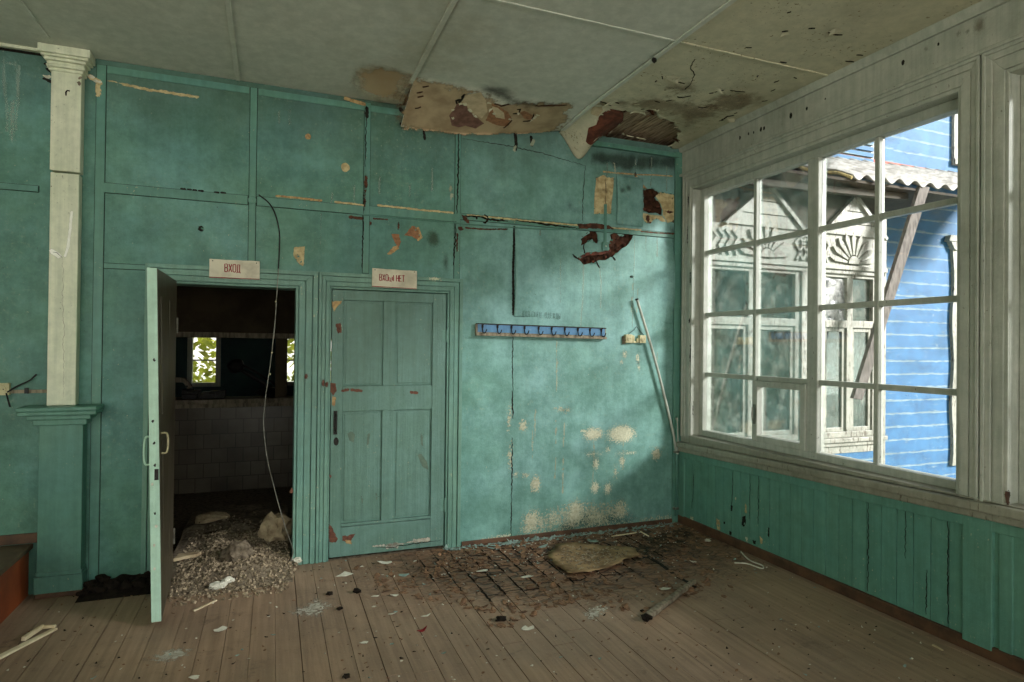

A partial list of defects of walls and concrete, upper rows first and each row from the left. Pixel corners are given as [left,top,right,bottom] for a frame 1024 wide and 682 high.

crack [780,11,863,62]
peeling [77,74,199,98]
water stain [360,68,573,136]
peeling [449,92,566,152]
crack [595,59,797,123]
peeling [293,246,305,266]
peeling [387,226,422,255]
flaking render [377,186,454,214]
spalling [467,171,674,268]
crack [420,340,687,604]
peeling [329,525,355,544]
peeling [371,423,714,630]